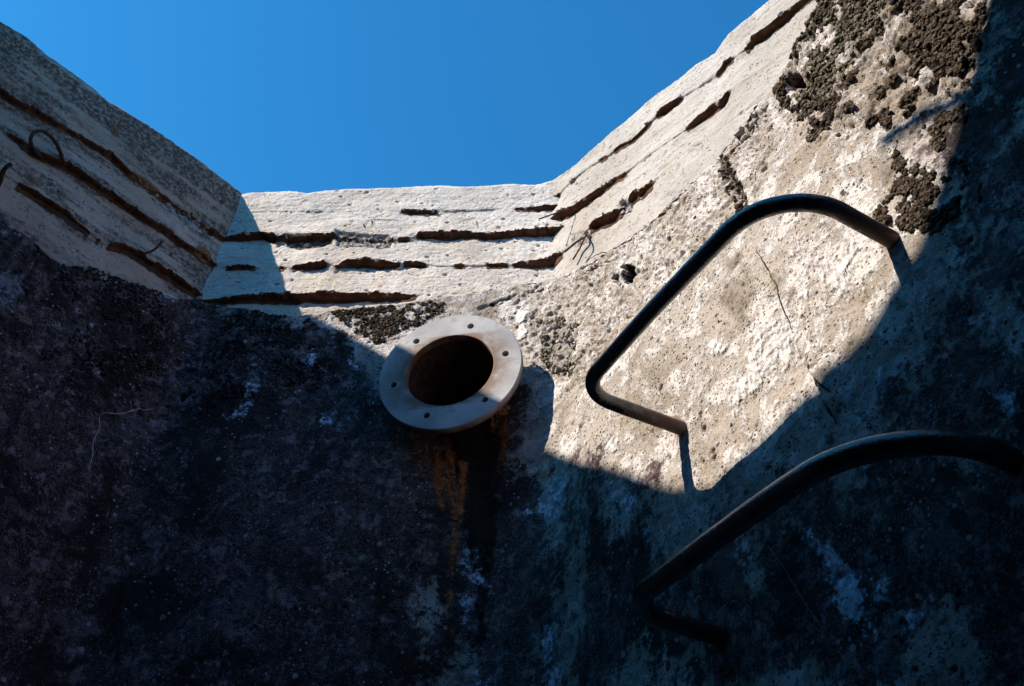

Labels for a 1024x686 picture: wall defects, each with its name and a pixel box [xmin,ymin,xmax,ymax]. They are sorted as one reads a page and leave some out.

spalling [271,231,392,250]
spalling [619,188,639,215]
crack [756,250,838,425]
rust [432,433,469,618]